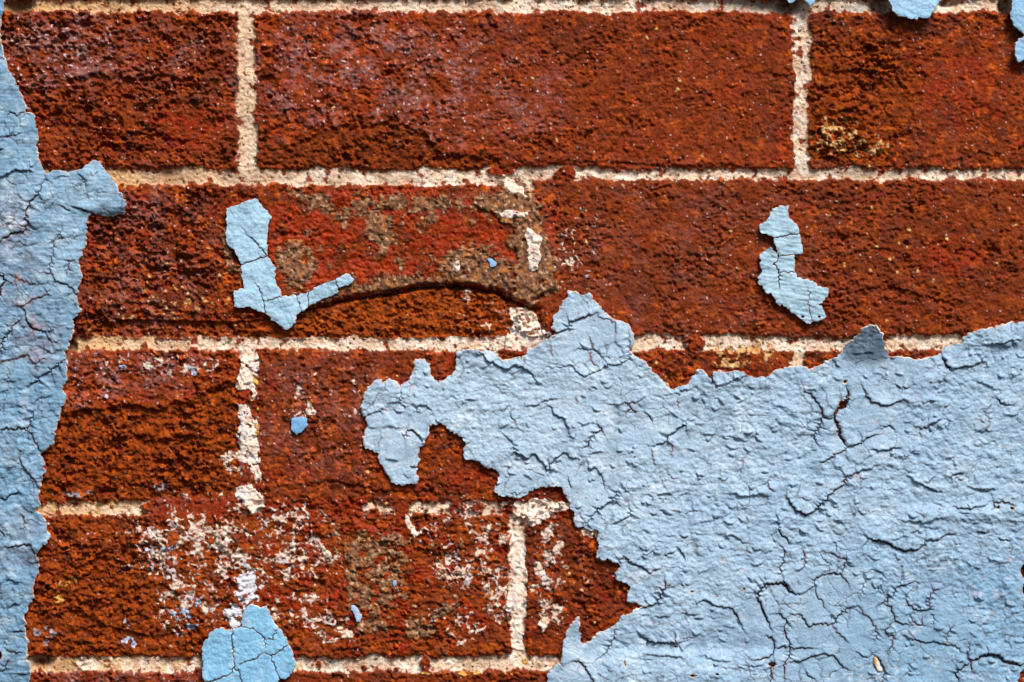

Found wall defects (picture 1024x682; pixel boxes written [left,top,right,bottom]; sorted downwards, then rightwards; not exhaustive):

peeling [888,0,941,20]
peeling [1010,0,1024,63]
crack [0,112,89,500]
peeling [0,0,506,682]
crack [369,396,432,440]
crack [479,313,688,526]
peeling [225,114,1024,682]
leakage [116,491,362,646]
leakage [418,494,514,646]
crack [619,549,685,608]
crack [697,386,1024,682]